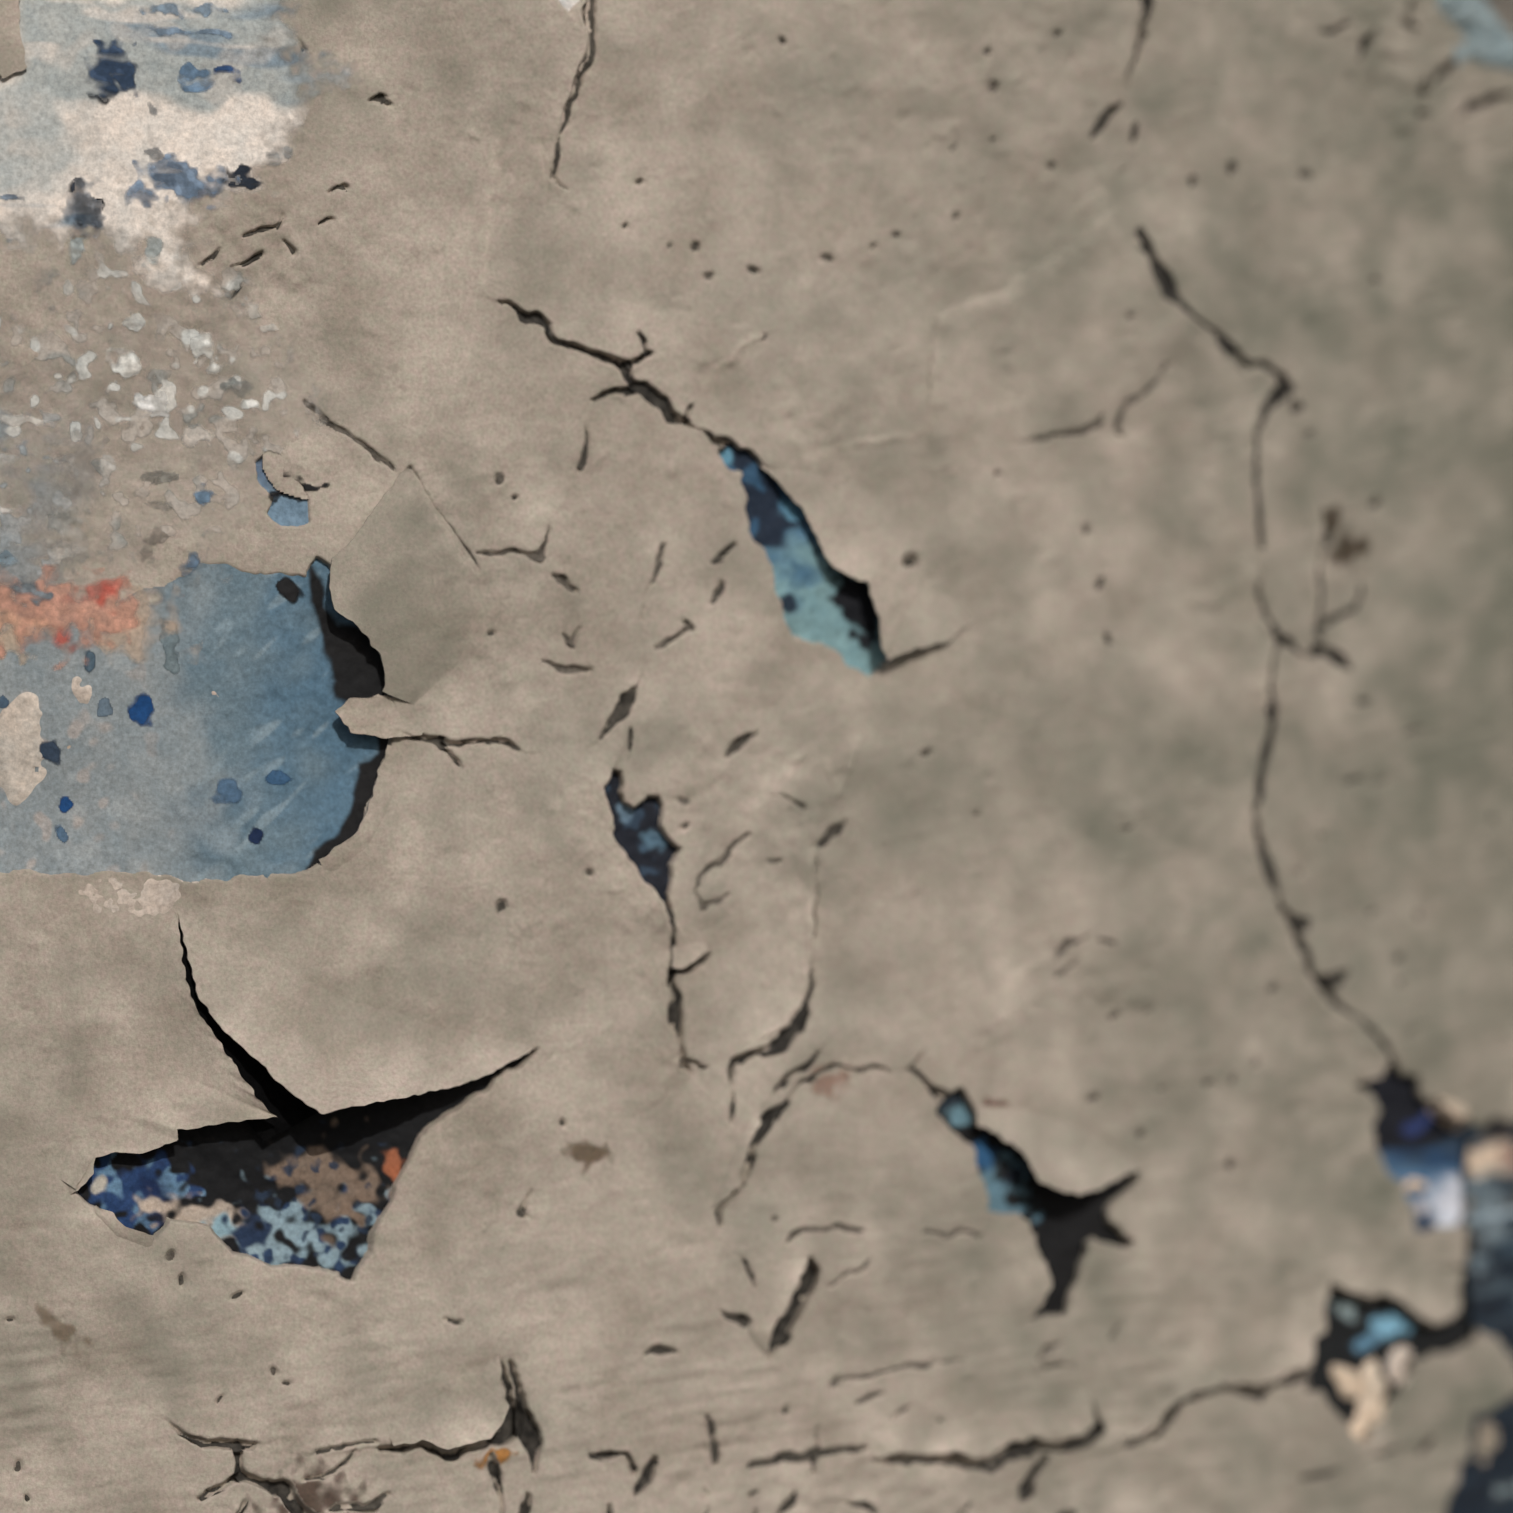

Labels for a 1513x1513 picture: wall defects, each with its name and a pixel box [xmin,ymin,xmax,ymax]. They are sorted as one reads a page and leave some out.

crack [552,0,596,188]
peeling [0,0,351,608]
peeling [0,468,479,882]
crack [499,301,747,470]
peeling [718,442,976,676]
crack [1090,0,1388,1052]
peeling [59,911,539,1285]
crack [664,833,941,1226]
peeling [936,1090,1142,1326]
peeling [1306,1030,1513,1441]
crack [178,1362,542,1513]
crack [705,1359,1310,1513]